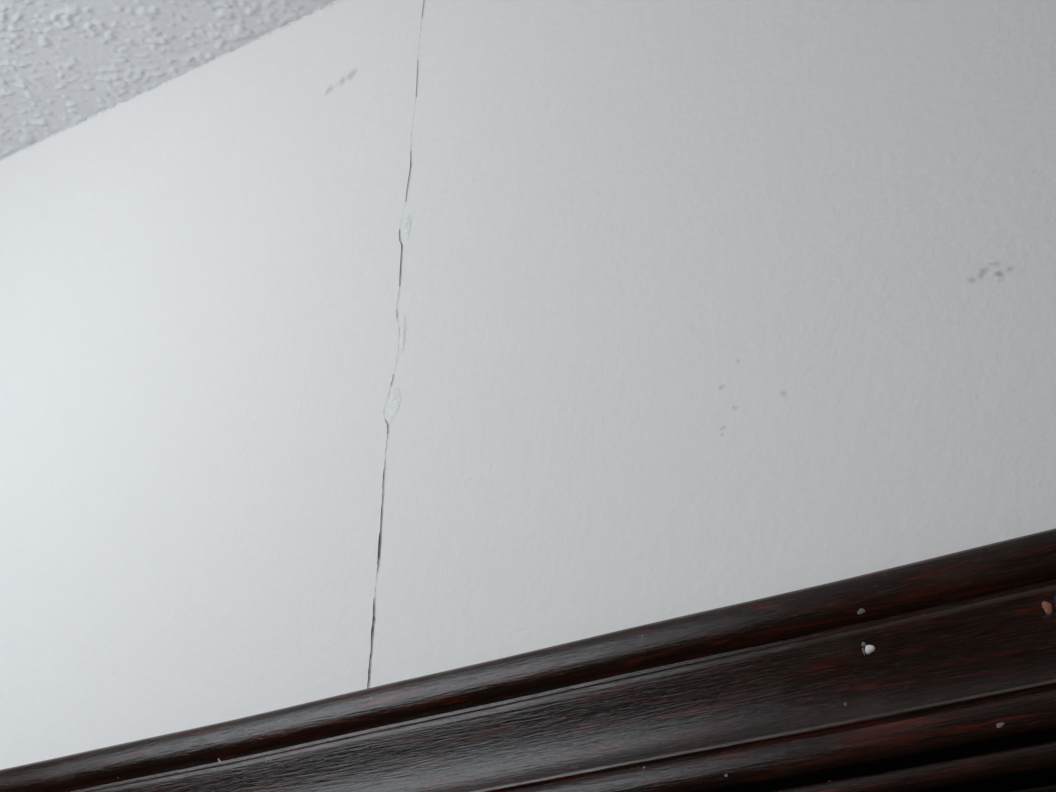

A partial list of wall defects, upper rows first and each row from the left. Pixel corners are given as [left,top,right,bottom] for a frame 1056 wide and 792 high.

crack [386,152,411,434]
crack [376,472,384,573]
crack [366,601,374,689]